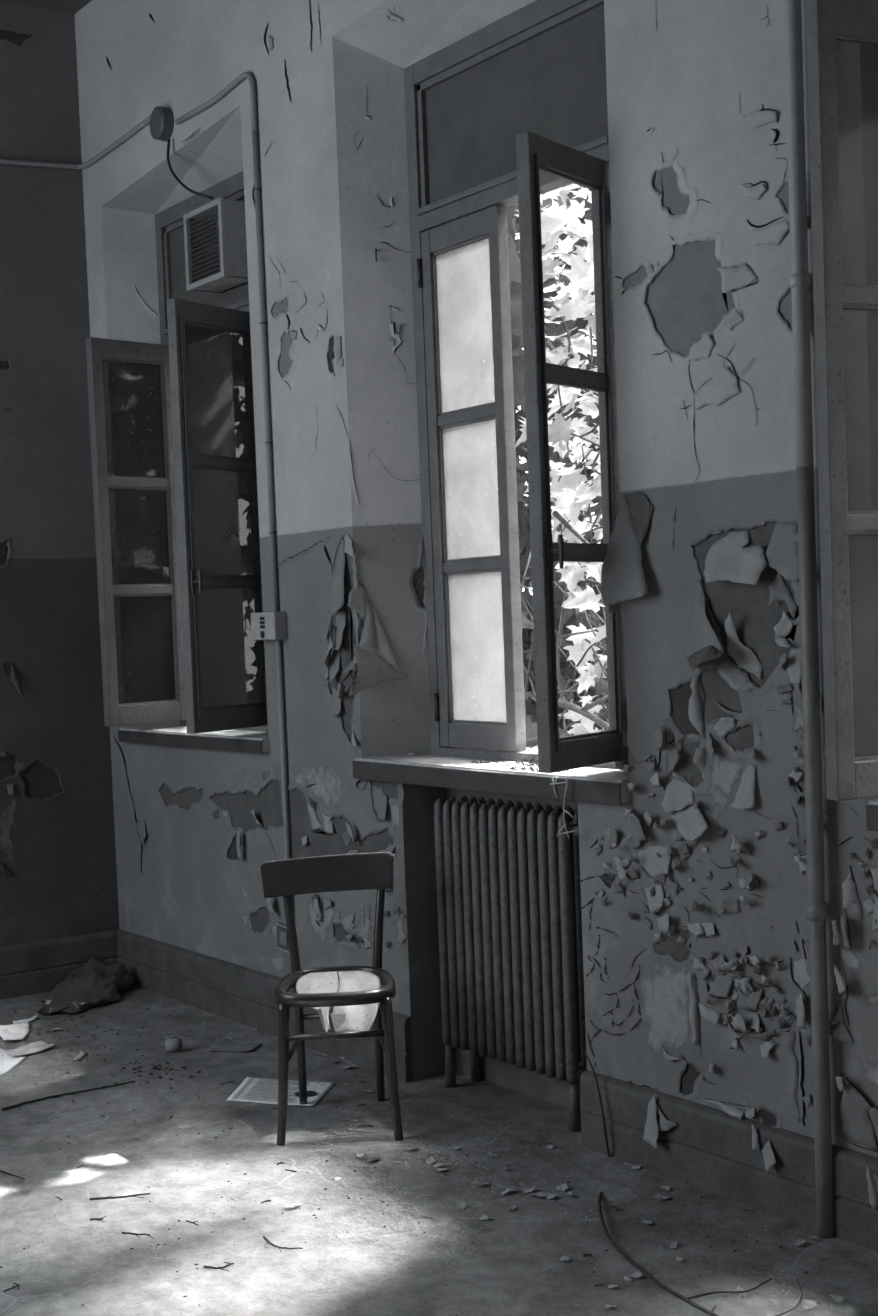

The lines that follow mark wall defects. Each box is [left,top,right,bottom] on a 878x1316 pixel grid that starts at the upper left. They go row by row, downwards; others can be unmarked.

peeling [613,152,758,361]
peeling [320,528,408,754]
peeling [601,492,654,614]
peeling [829,836,878,1153]
peeling [866,1167,878,1210]